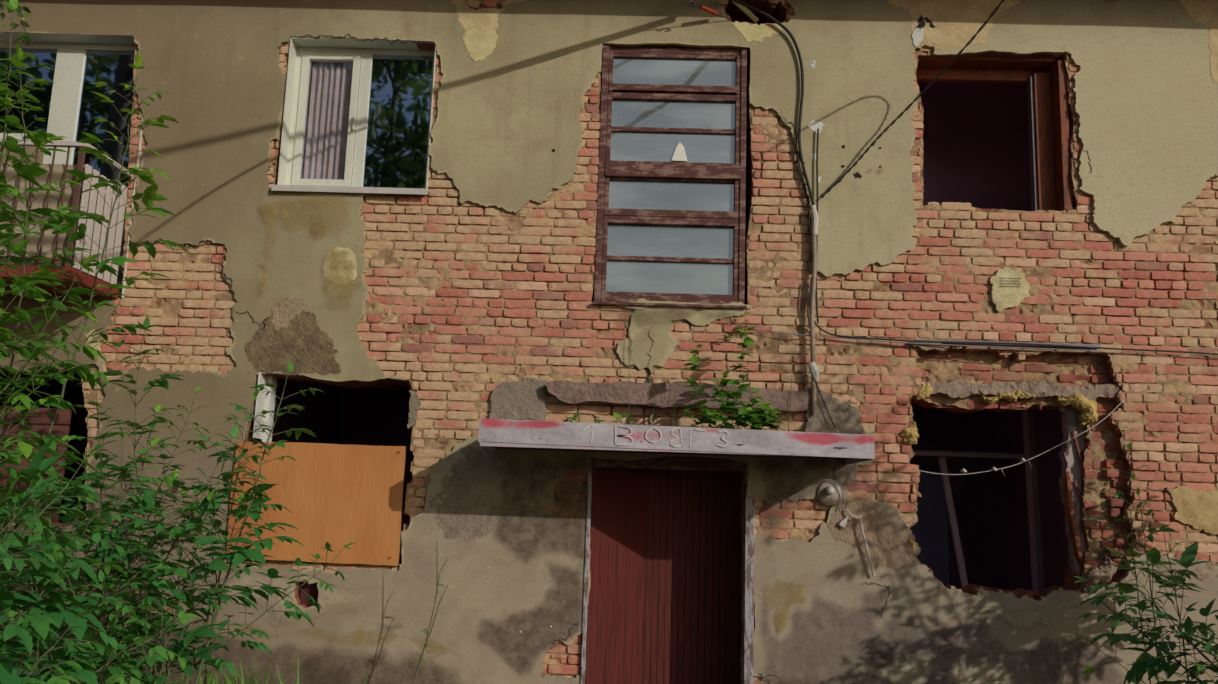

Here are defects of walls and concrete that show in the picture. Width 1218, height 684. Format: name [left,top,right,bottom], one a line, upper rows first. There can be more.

flaking render [81,42,341,461]
flaking render [358,0,1218,581]
leakage [132,631,451,684]
leakage [491,570,579,671]
flaking render [541,633,582,678]
leakage [765,583,1118,684]